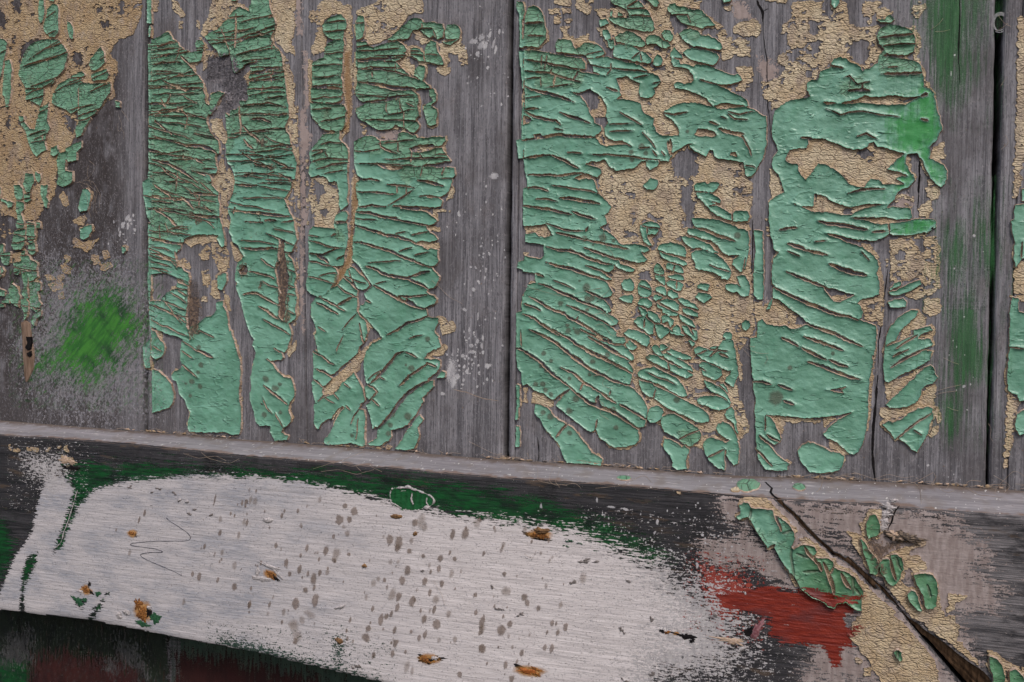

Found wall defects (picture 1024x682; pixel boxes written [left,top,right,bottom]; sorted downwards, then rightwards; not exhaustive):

peeling [0,0,468,451]
peeling [515,0,948,474]
peeling [1002,16,1024,469]
peeling [688,479,1024,682]
crack [765,482,992,682]